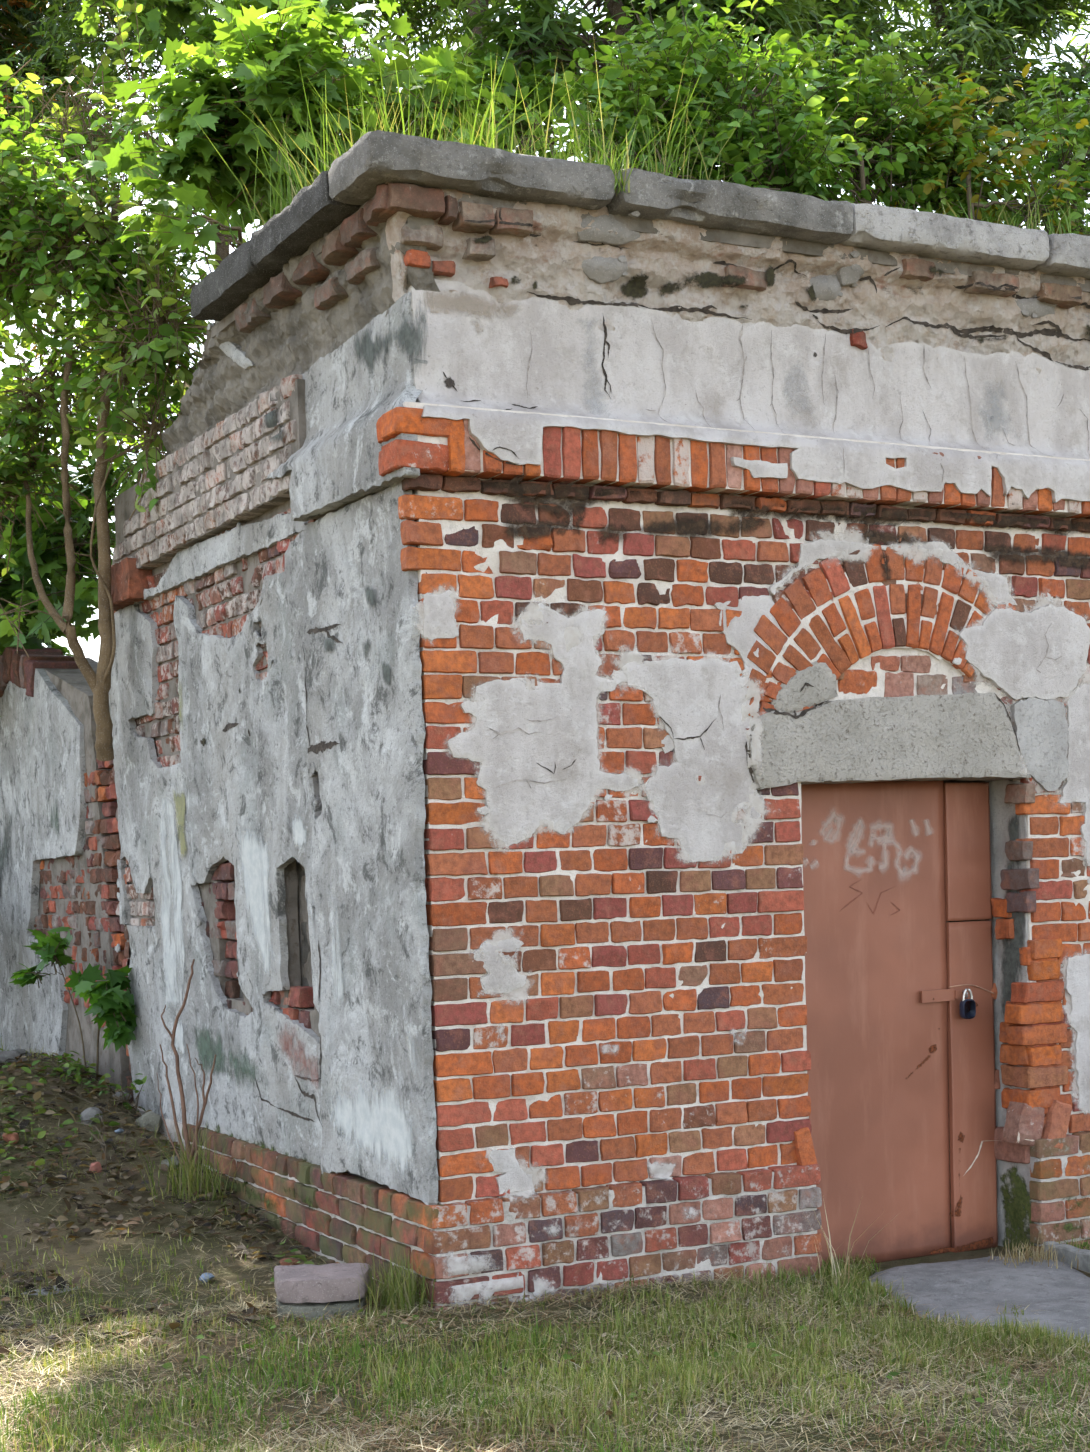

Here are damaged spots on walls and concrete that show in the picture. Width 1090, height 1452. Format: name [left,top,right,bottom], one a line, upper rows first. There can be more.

crack [714,259,736,267]
crack [464,331,538,410]
crack [529,292,784,433]
crack [774,259,1090,481]
crack [469,437,517,465]
spalling [132,519,318,767]
peeling [414,586,459,642]
peeling [447,527,1090,884]
peeling [473,929,530,1002]
peeling [1060,951,1090,1113]
peeling [486,1148,545,1201]